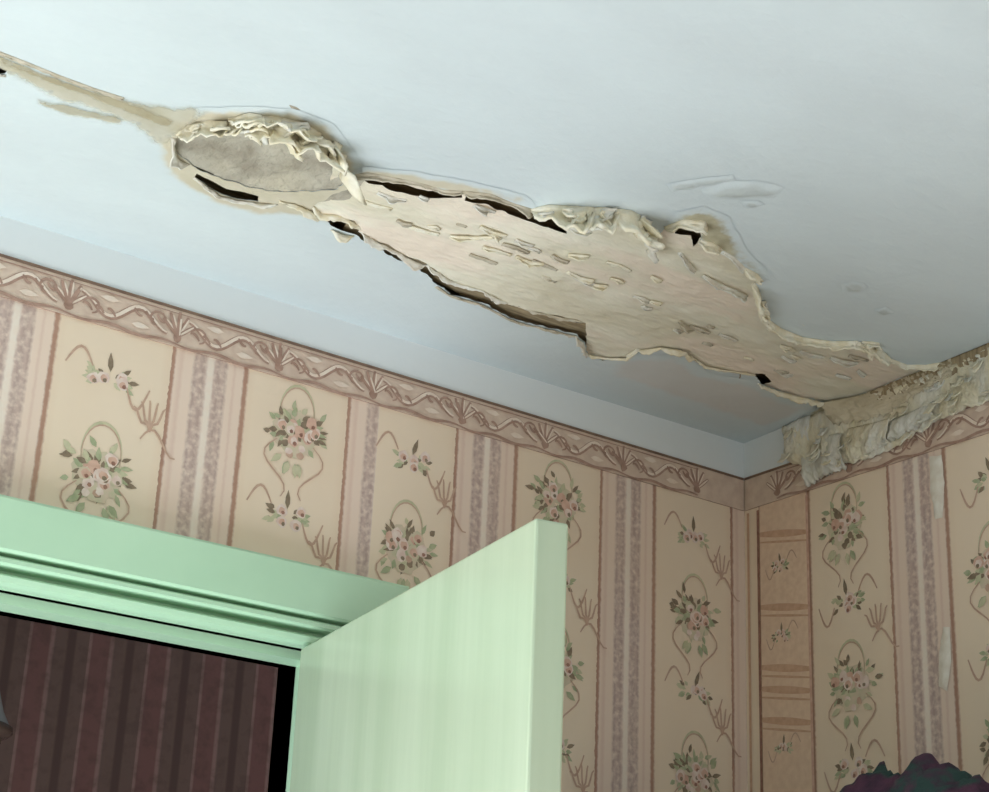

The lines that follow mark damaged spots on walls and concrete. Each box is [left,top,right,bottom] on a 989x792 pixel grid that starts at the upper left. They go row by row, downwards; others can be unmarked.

spalling [169,105,989,487]